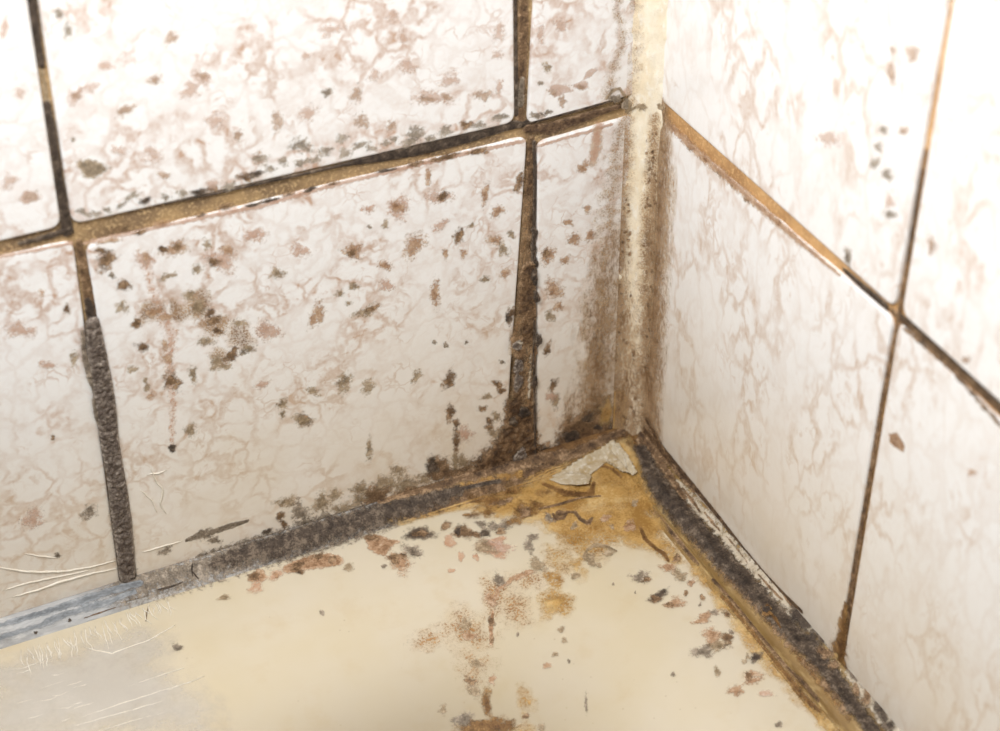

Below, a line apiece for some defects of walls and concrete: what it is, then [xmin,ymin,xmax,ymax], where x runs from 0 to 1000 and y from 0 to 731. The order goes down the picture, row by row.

water stain [17,0,150,245]
water stain [162,0,597,201]
water stain [0,100,900,731]
peeling [549,440,637,485]